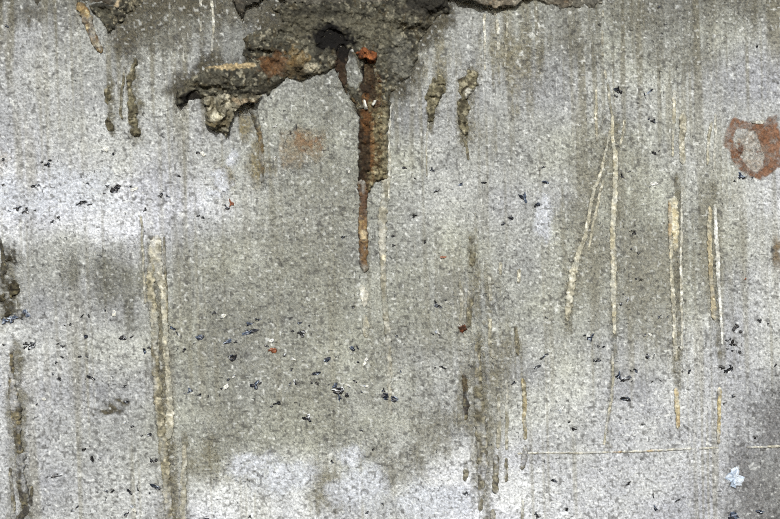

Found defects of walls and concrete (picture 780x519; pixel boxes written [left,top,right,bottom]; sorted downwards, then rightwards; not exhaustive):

peeling [89,2,133,33]
corrosion [726,118,780,179]
damp [0,238,24,322]
corrosion [344,64,394,415]
damp [458,234,489,333]
damp [535,196,550,240]
damp [561,116,683,386]
damp [6,342,33,519]
damp [138,235,188,519]
damp [231,414,451,506]
damp [457,326,520,519]
damp [520,378,528,470]